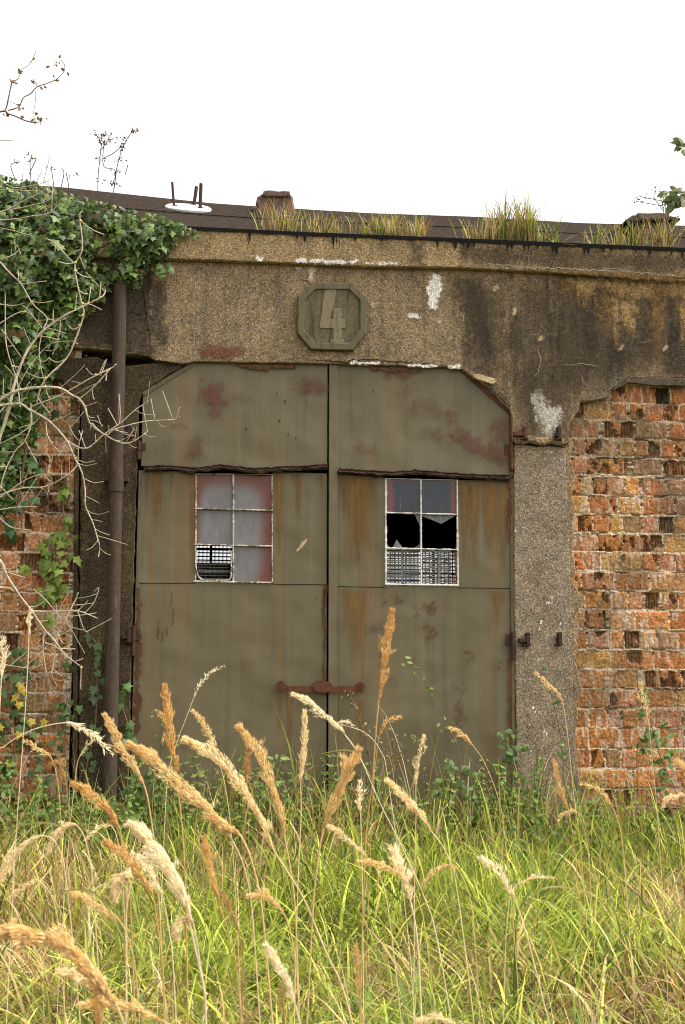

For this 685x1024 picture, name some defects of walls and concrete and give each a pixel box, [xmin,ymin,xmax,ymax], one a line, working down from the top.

damp [458,244,685,437]
spalling [655,387,671,405]
spalling [571,377,644,495]
rust [144,463,512,554]
spalling [577,515,663,553]
spalling [579,572,614,591]
spalling [643,591,660,610]